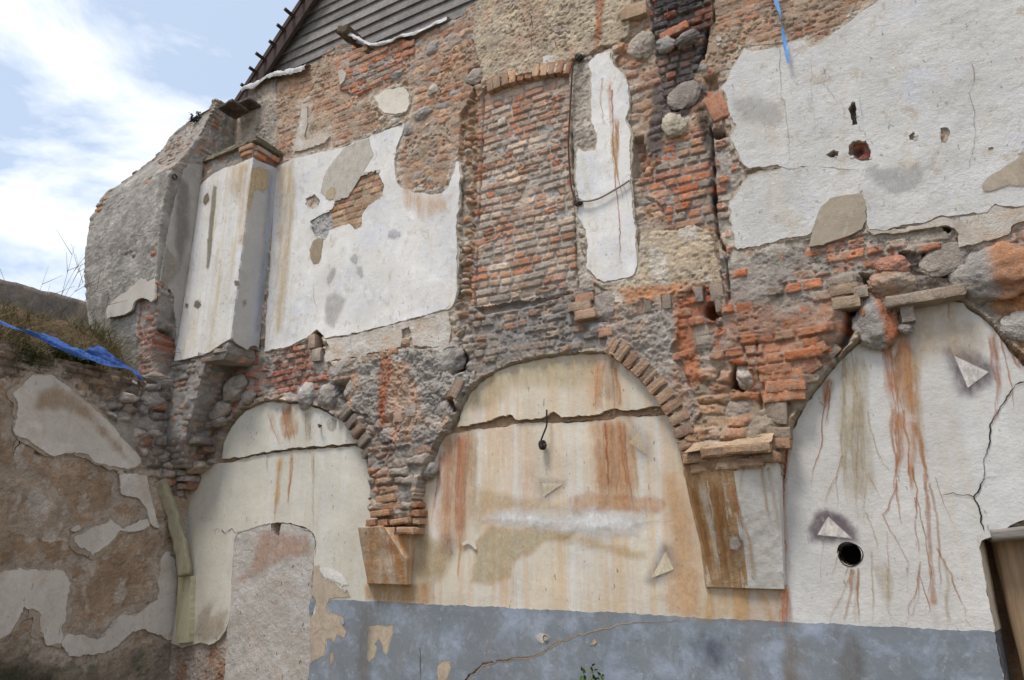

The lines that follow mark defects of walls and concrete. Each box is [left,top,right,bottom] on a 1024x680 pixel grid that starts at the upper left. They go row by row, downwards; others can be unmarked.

spalling [305,138,384,264]
rust [600,86,621,247]
spalling [825,139,872,161]
rust [282,406,294,437]
rust [438,436,476,567]
rust [882,345,946,614]
crack [943,381,1024,530]
spalling [68,533,161,638]
peeling [310,566,350,665]
peeling [366,625,393,662]
rust [834,552,859,614]